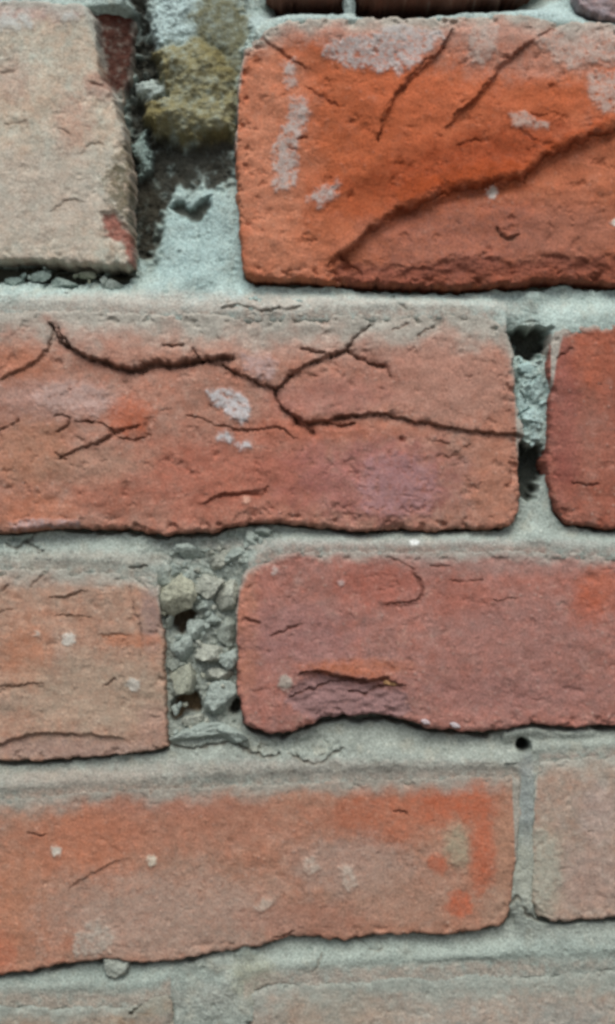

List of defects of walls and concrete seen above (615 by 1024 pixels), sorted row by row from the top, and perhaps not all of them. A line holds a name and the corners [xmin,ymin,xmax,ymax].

crack [254,34,340,108]
crack [376,28,456,142]
crack [445,27,557,131]
crack [323,111,615,272]
crack [0,294,540,462]
spalling [506,324,555,504]
spalling [159,525,278,744]
spalling [282,673,430,724]